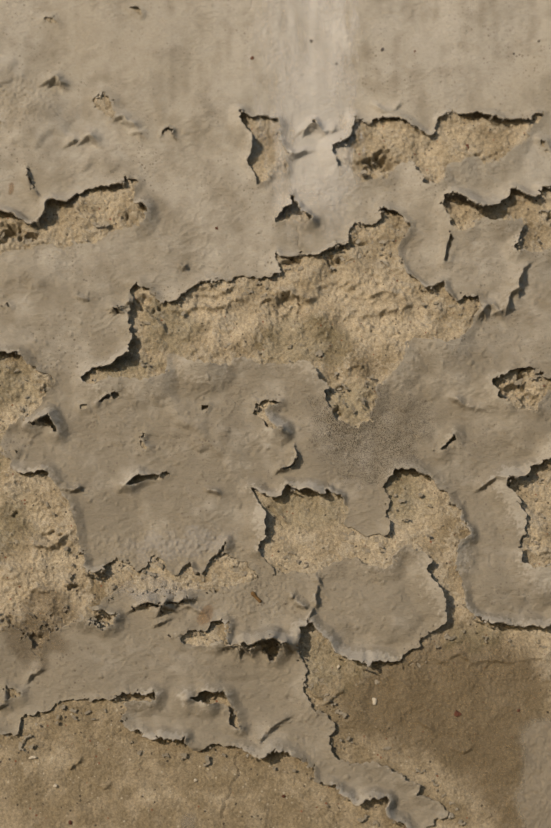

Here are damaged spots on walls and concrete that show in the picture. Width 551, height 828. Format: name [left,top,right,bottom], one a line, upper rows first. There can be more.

spalling [0,163,160,255]
peeling [60,92,179,151]
spalling [71,100,551,428]
spalling [0,344,551,828]